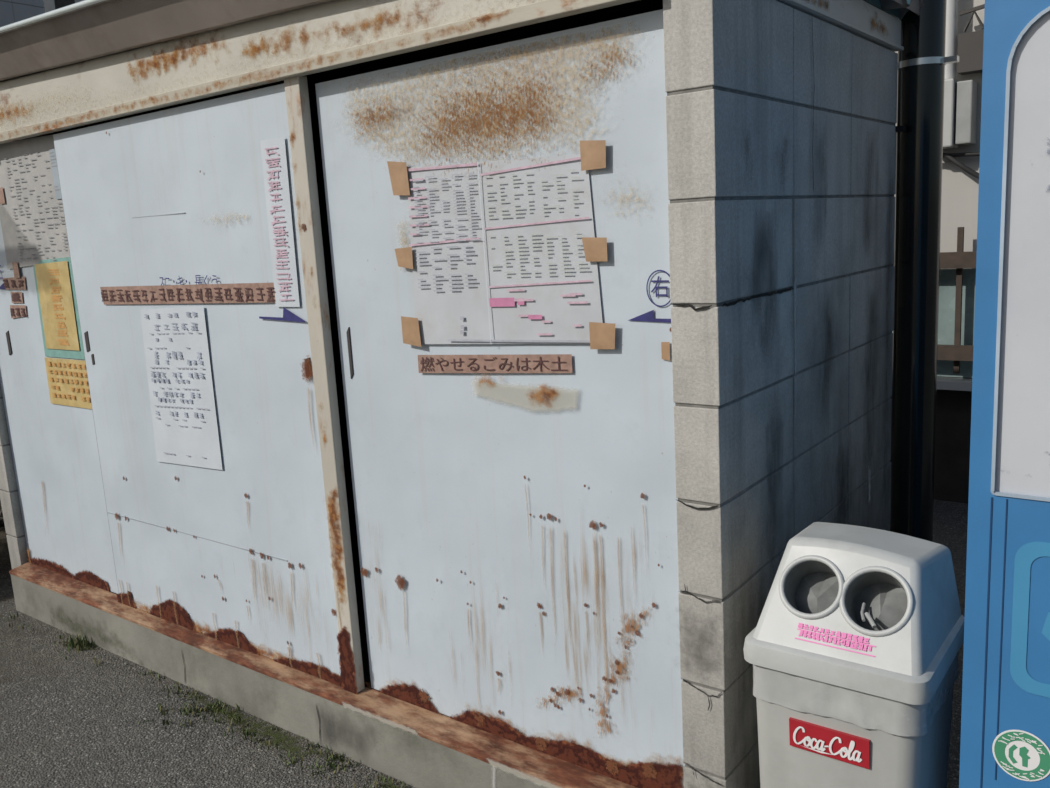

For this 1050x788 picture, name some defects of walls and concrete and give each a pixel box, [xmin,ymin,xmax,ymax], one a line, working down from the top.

corrosion [245,32,309,56]
corrosion [352,31,631,171]
crack [671,287,794,311]
corrosion [328,490,345,616]
corrosion [27,550,683,788]